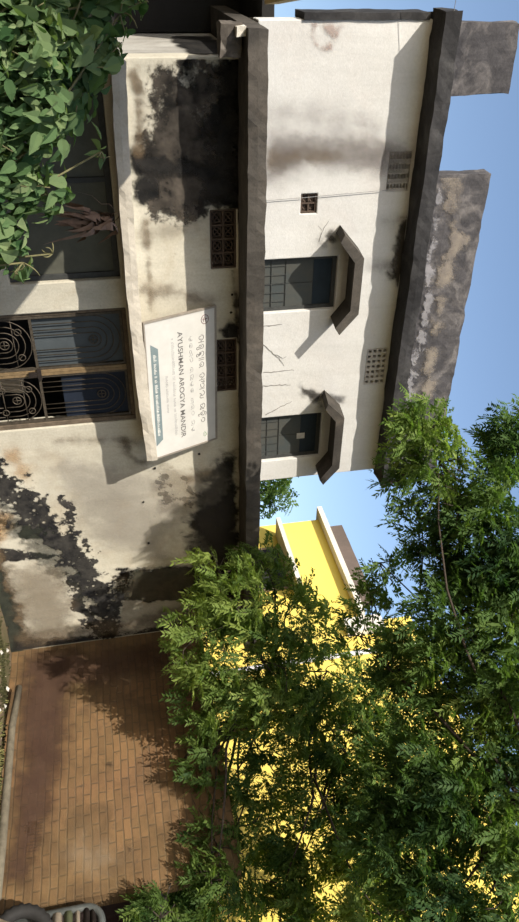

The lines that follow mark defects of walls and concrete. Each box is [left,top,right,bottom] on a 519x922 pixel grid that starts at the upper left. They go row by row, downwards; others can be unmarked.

water stain [130,36,239,225]
water stain [270,139,388,171]
crack [263,324,292,415]
water stain [184,453,239,611]
water stain [0,550,199,880]